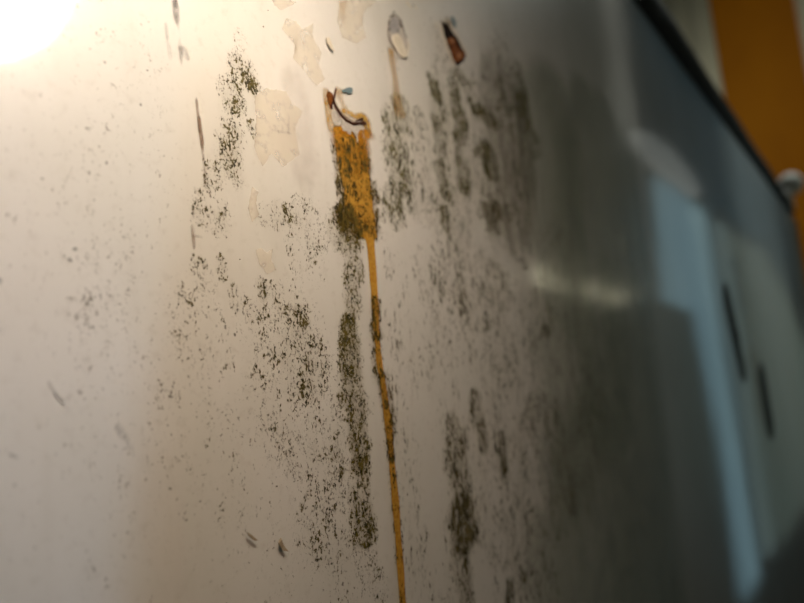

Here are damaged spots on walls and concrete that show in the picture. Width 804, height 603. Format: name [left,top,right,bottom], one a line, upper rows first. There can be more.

leakage [191,31,261,238]
leakage [169,193,389,603]
peeling [326,87,366,142]
corrosion [324,90,407,603]
leakage [377,19,611,603]